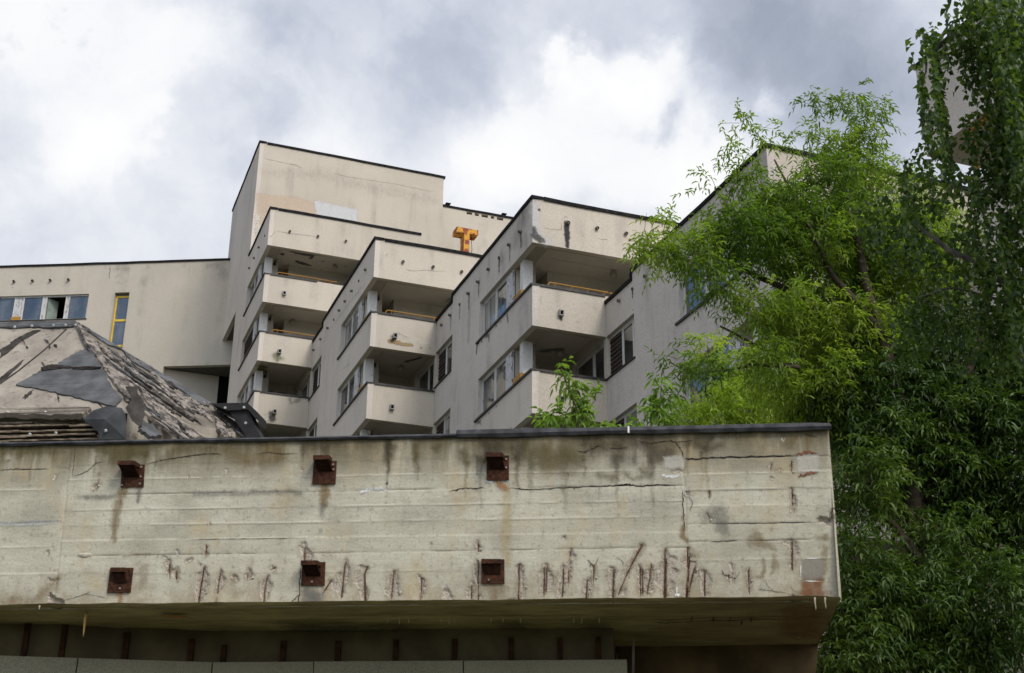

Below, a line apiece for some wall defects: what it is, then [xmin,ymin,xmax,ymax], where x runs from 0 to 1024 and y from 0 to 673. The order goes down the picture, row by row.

peeling [75,322,234,439]
crack [151,453,221,463]
damp [385,439,393,464]
crack [579,440,791,460]
crack [515,483,693,533]
spalling [160,545,277,602]
spalling [322,557,370,601]
spalling [441,539,483,600]
spalling [506,535,713,603]
crack [712,522,802,542]
spalling [782,538,801,570]
corrosion [802,579,824,596]